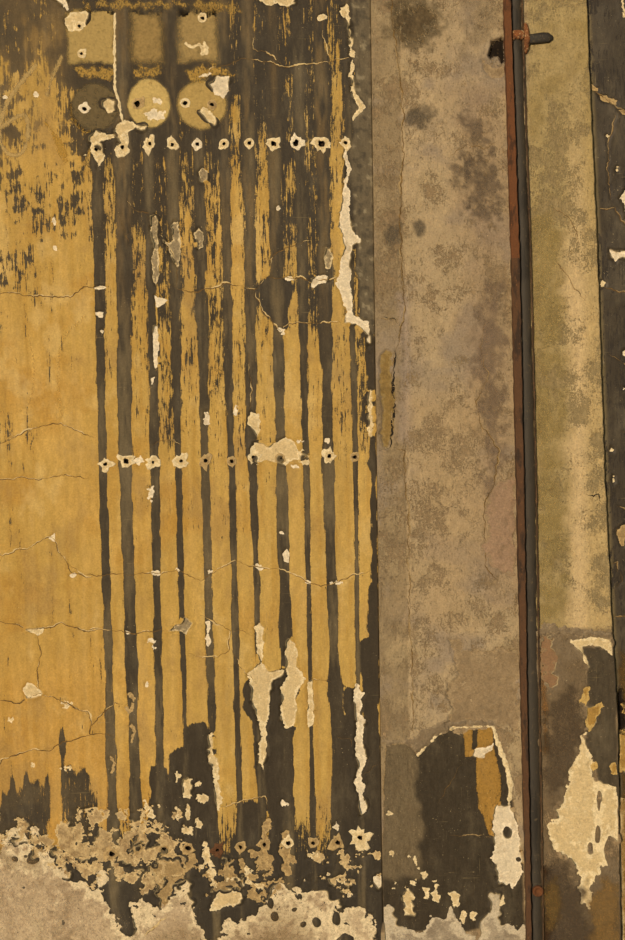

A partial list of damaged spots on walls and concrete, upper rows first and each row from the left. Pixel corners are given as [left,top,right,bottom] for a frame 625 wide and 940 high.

crack [2,422,94,443]
crack [0,473,84,481]
crack [0,536,368,587]
crack [190,615,254,681]
crack [0,621,161,764]
peeling [0,731,297,911]
spalling [416,639,524,906]
flaking render [547,686,625,909]
leakage [0,826,206,940]
peeling [307,823,394,898]
leakage [218,872,526,940]
peeling [370,855,478,924]